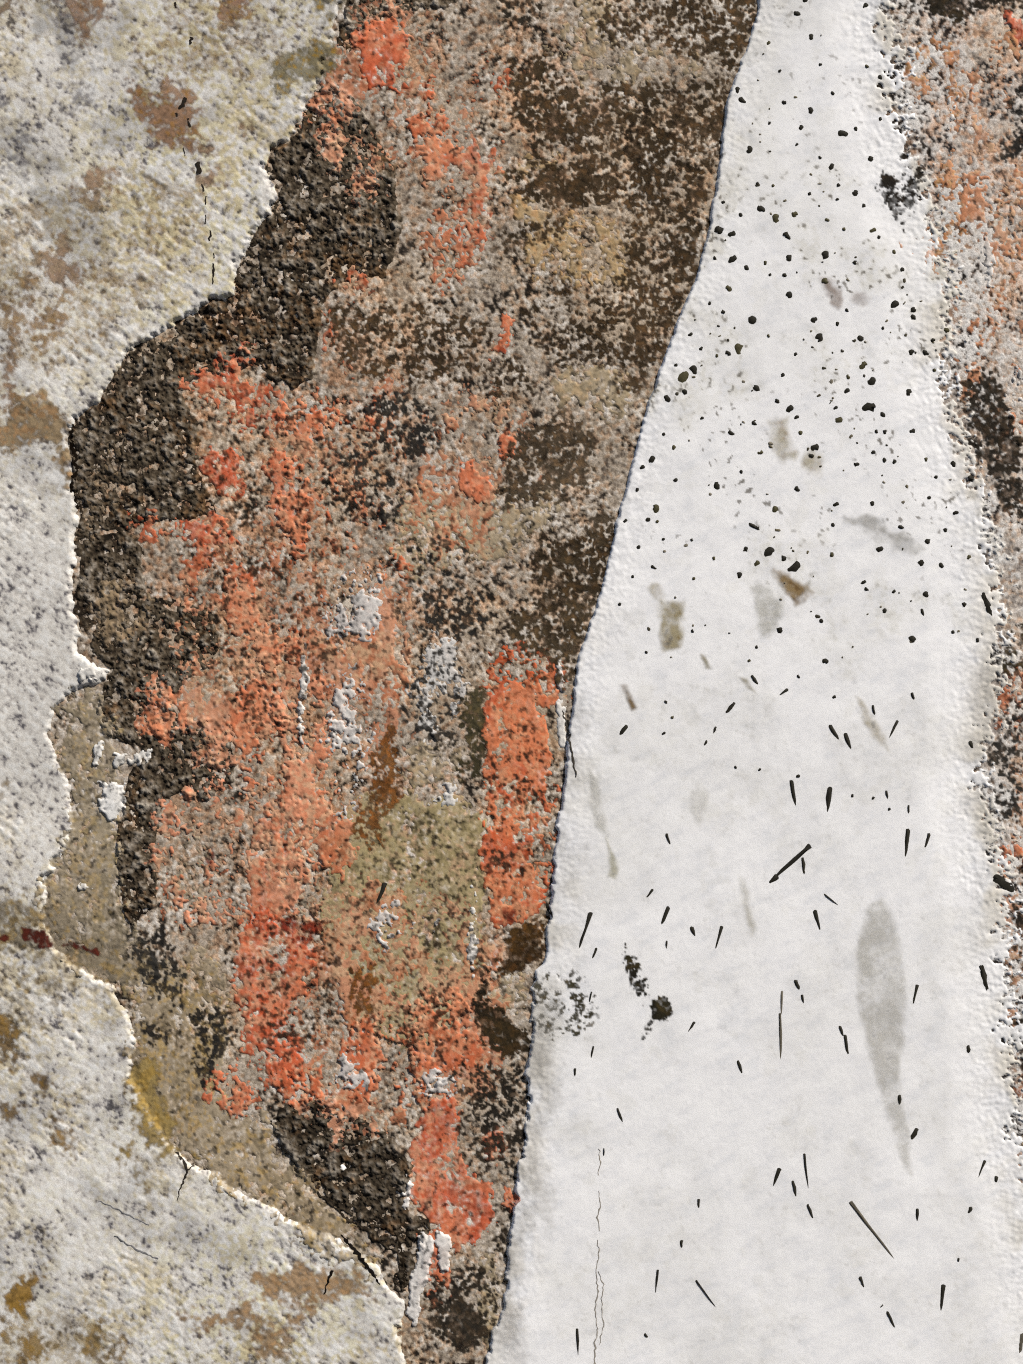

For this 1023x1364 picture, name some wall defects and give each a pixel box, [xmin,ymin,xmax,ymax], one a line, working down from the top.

peeling [542,0,706,126]
peeling [899,9,1023,434]
spalling [31,0,638,1352]
peeling [994,636,1023,1028]
crack [593,1150,605,1364]